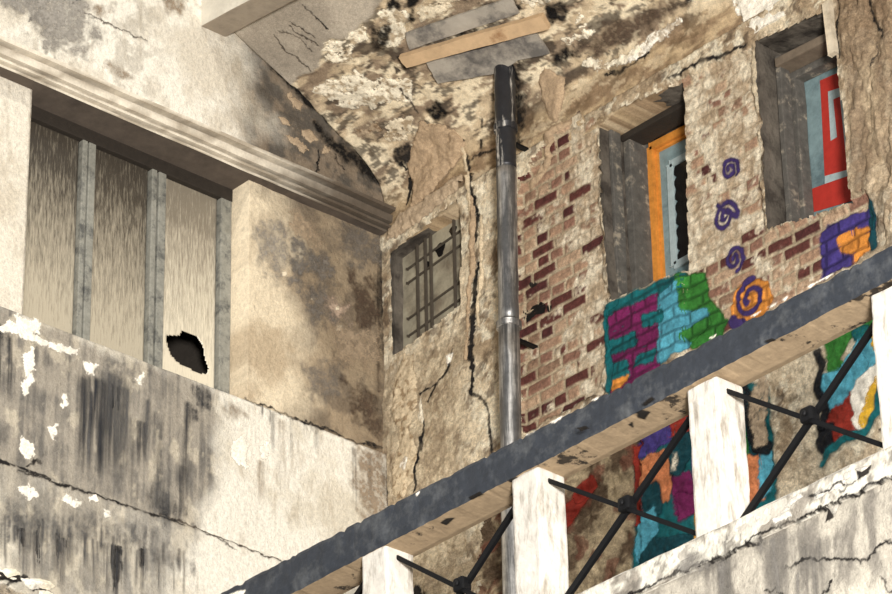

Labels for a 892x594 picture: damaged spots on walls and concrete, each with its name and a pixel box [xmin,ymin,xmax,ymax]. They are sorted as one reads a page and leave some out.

peeling [312,0,460,110]
leakage [553,0,692,62]
peeling [582,17,683,71]
crack [834,0,842,58]
leakage [426,100,449,121]
leakage [394,145,410,167]
spalling [669,47,869,338]
crack [413,119,496,493]
peeling [0,312,99,396]
leakage [80,374,129,464]
crack [0,459,282,562]
crack [627,476,892,594]